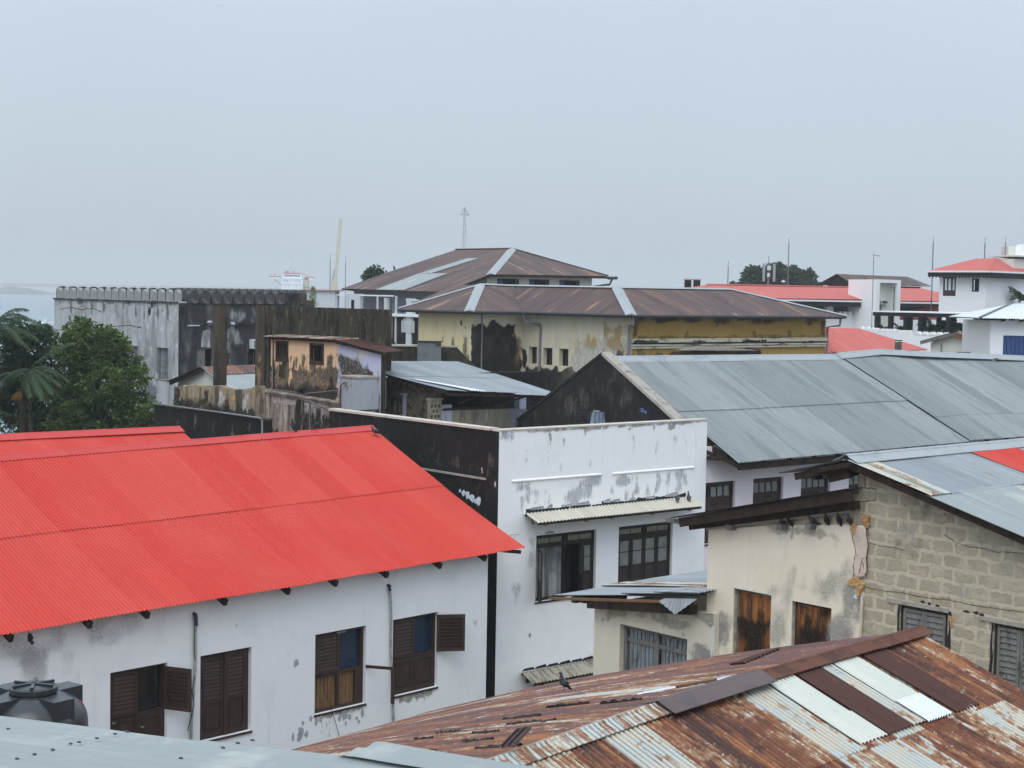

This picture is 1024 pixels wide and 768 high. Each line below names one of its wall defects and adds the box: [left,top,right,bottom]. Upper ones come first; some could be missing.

water stain [452,320,575,391]
peeling [573,334,627,369]
water stain [174,354,373,431]
spalling [526,491,686,513]
flaking render [850,514,870,578]
crack [851,482,1023,612]
water stain [801,574,861,640]
corrosion [676,678,717,688]
corrosion [820,663,926,725]